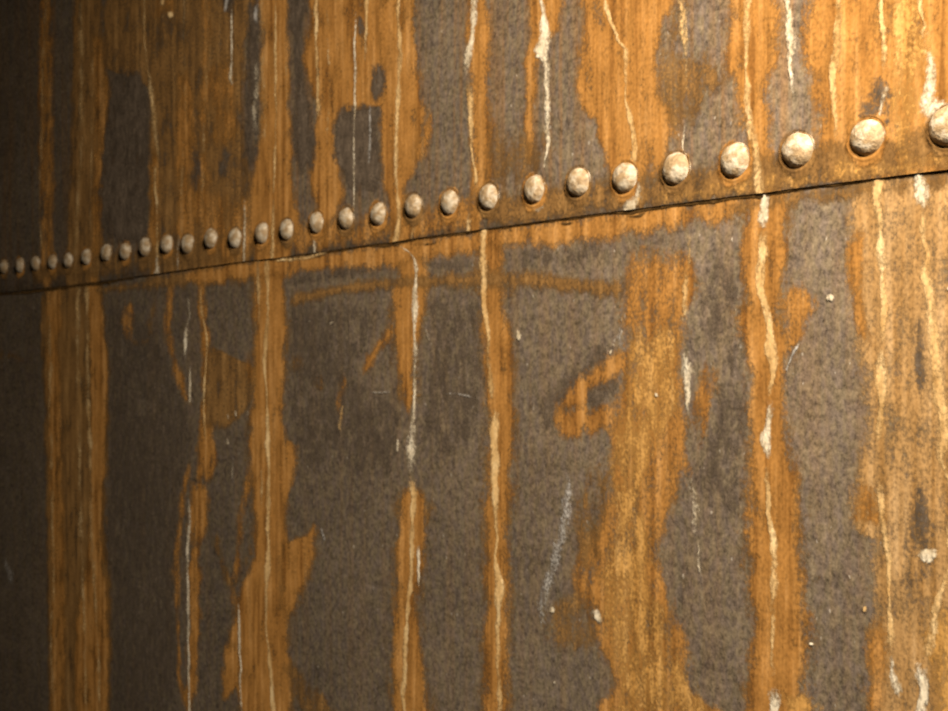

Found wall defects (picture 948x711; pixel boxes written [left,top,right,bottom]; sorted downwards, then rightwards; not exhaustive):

damp [534,0,550,161]
corrosion [449,0,948,233]
damp [872,179,889,340]
corrosion [31,0,482,711]
corrosion [479,189,813,711]
corrosion [808,171,948,711]
damp [875,352,887,438]
damp [878,489,902,644]
damp [890,661,901,693]
damp [916,670,928,711]